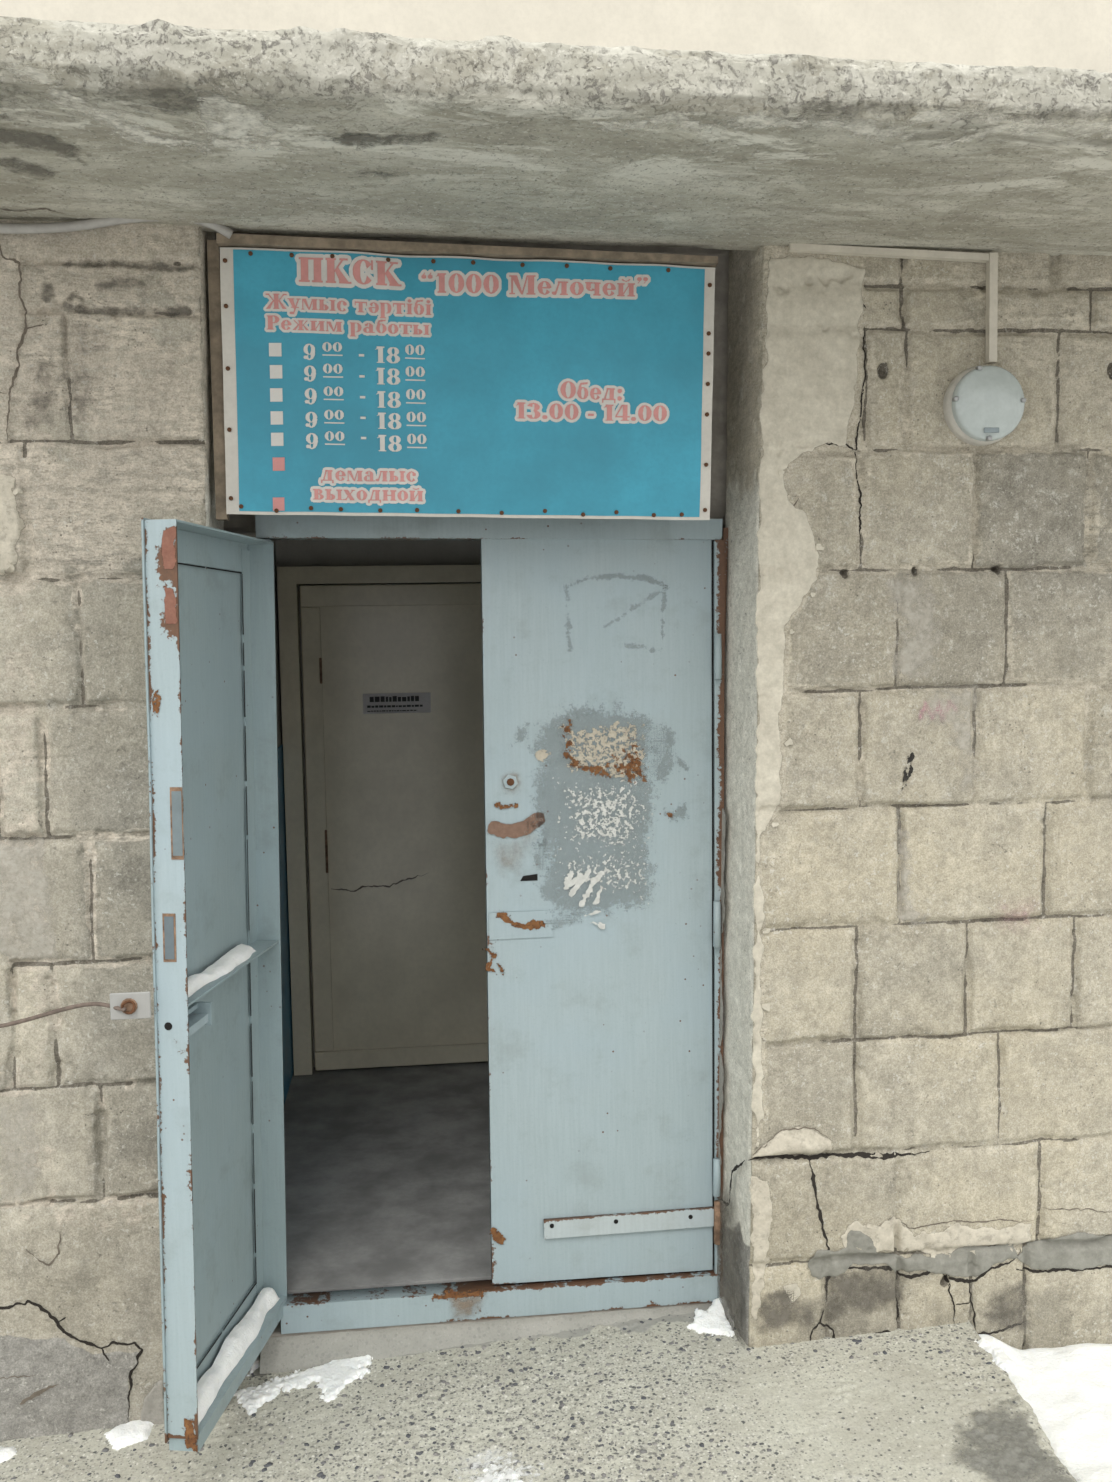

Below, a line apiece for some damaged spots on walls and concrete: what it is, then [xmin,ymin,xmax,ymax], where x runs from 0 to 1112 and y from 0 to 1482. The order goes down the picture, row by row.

crack [0,208,64,440]
corrosion [487,802,545,838]
peeling [553,712,653,929]
crack [334,873,427,892]
corrosion [496,912,546,930]
crack [26,1235,61,1266]
crack [722,1151,1112,1341]
crack [0,1300,143,1421]